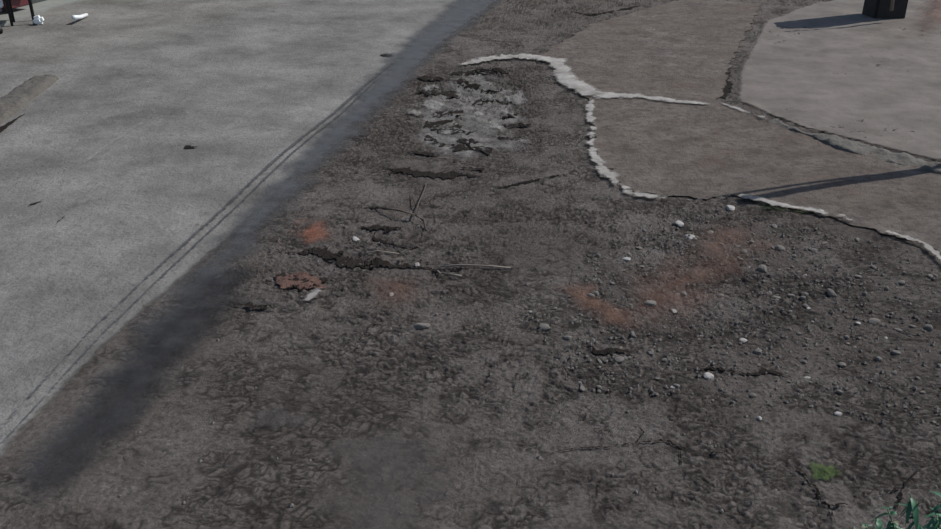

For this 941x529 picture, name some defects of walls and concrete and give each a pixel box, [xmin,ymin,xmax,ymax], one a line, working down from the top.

crack [573,6,637,16]
crack [721,67,734,104]
spalling [407,67,532,171]
water stain [460,53,709,198]
crack [387,167,567,187]
water stain [739,194,853,220]
crack [277,206,462,272]
water stain [886,230,941,260]